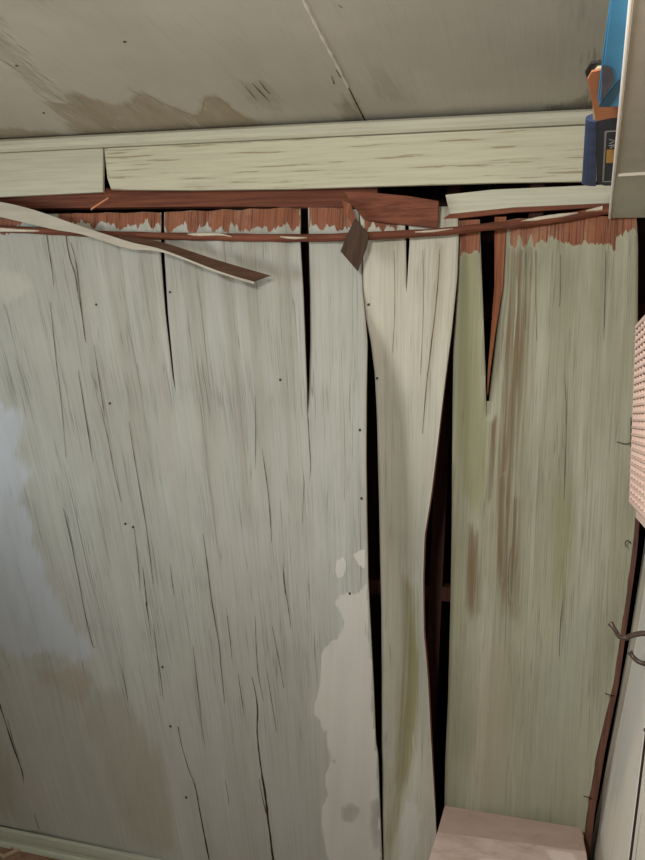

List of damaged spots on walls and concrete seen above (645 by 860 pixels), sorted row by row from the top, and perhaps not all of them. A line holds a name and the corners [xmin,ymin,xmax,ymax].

damp [0,85,280,139]
crack [331,70,366,121]
peeling [0,217,39,239]
peeling [55,208,405,239]
peeling [506,206,637,255]
crack [46,235,174,696]
crack [255,405,272,543]
damp [417,239,608,825]
crack [203,536,291,860]
crack [0,705,24,783]
crack [178,727,210,860]